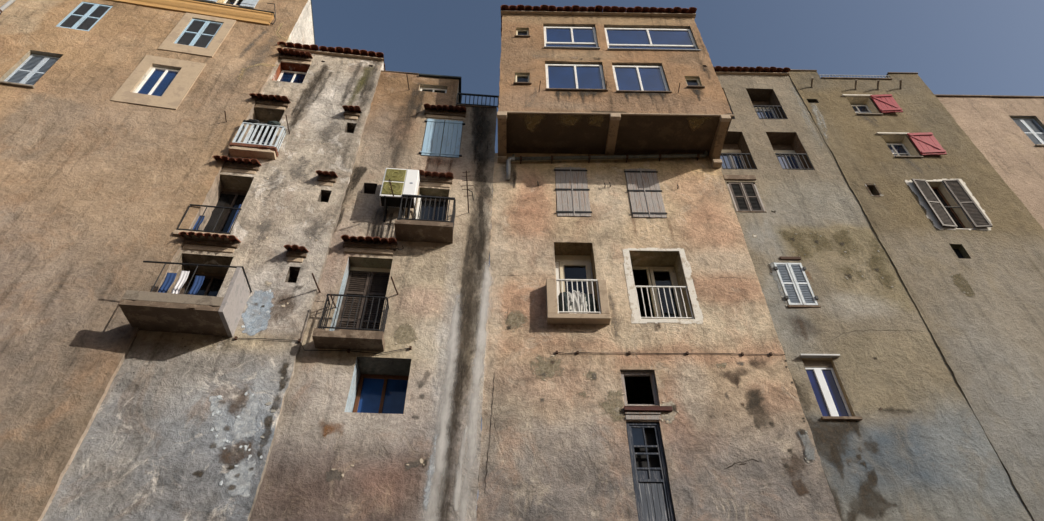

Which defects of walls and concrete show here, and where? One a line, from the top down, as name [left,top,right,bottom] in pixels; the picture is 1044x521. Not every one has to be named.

peeling [241,281,273,335]
damp [424,107,492,521]
peeling [209,362,289,497]
damp [723,360,774,428]
damp [793,380,897,521]